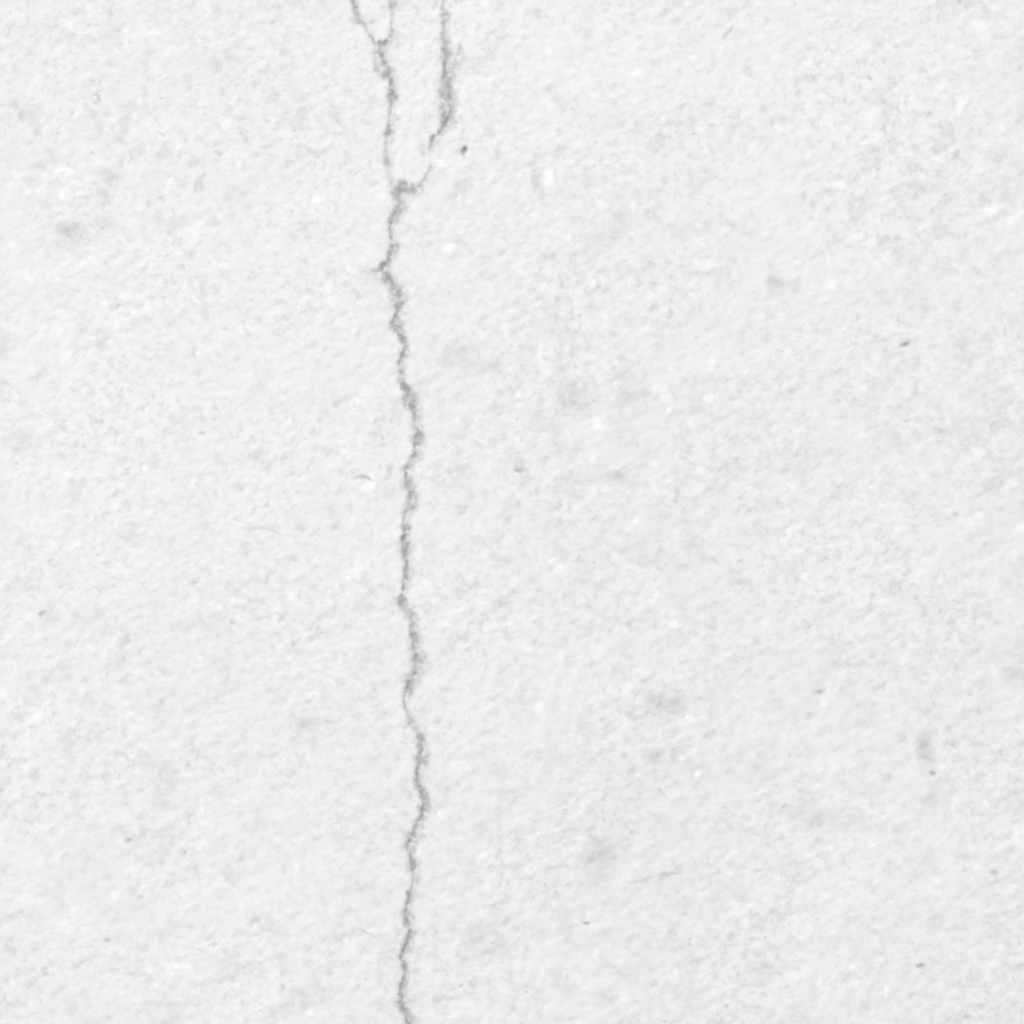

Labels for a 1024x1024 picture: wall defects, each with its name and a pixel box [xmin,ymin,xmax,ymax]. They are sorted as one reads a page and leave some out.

crack [347,0,465,1024]